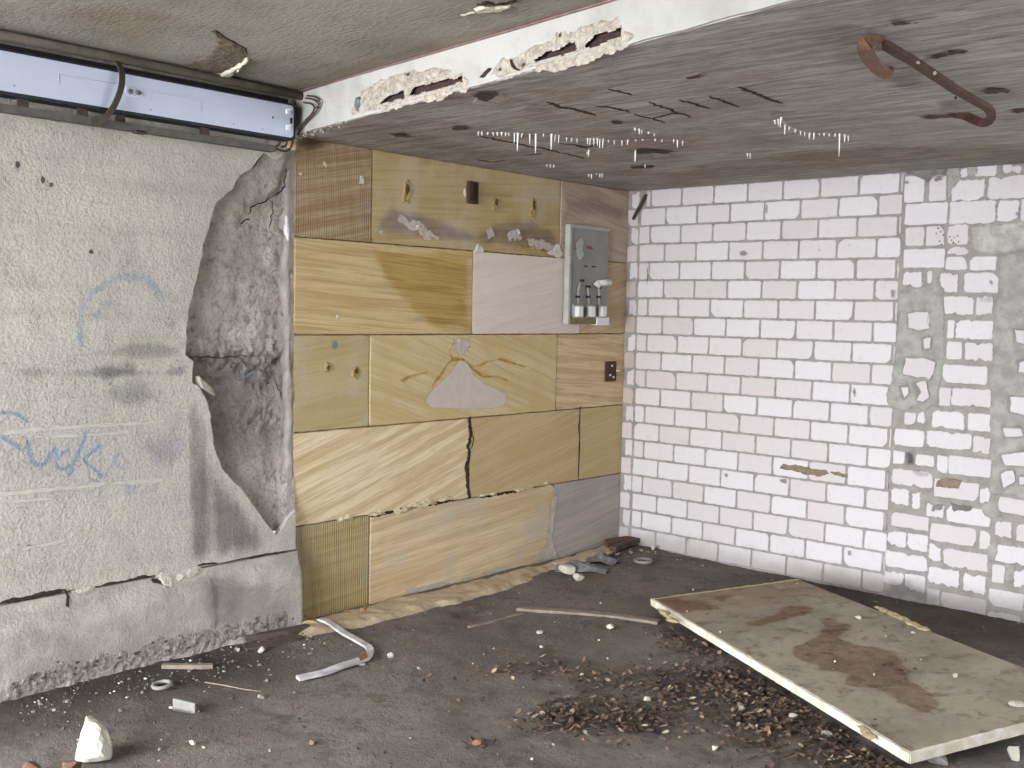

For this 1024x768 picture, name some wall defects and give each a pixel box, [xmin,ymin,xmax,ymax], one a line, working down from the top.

corrosion [929,50,967,59]
crack [546,87,782,123]
damp [478,128,688,162]
spalling [181,16,635,531]
crack [575,406,583,475]
crack [464,417,474,499]
crack [248,551,286,559]
crack [0,589,69,607]
crack [96,575,169,588]